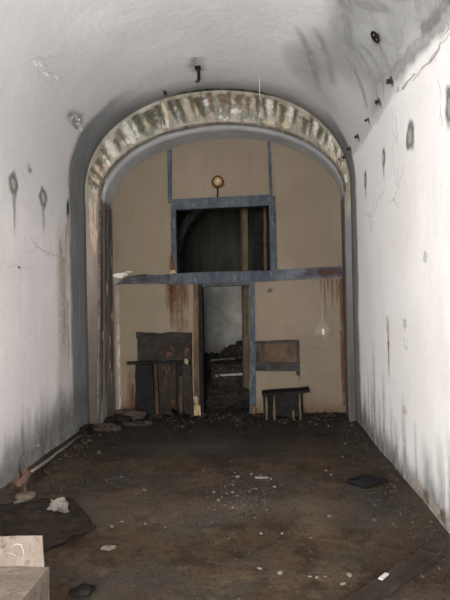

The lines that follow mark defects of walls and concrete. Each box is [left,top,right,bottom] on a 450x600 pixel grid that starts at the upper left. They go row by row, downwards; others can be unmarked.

water stain [337,0,450,106]
spalling [68,111,83,132]
peeling [89,95,347,255]
corrosion [317,267,345,405]
water stain [0,398,86,489]
water stain [360,416,450,534]